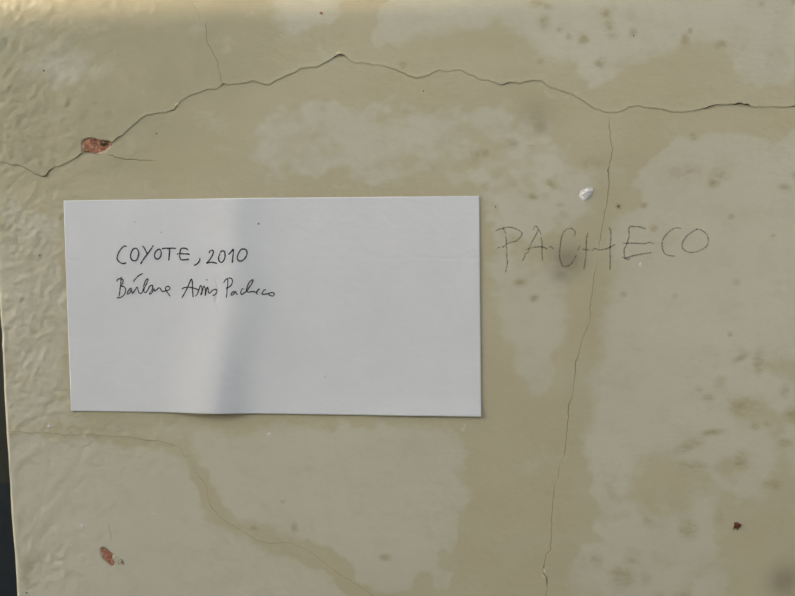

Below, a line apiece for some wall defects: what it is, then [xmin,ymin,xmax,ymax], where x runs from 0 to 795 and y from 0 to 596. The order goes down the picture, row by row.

spalling [82,138,112,154]
crack [3,4,366,177]
water stain [0,0,795,241]
water stain [0,143,795,596]
crack [395,69,764,593]
spalling [101,548,125,566]